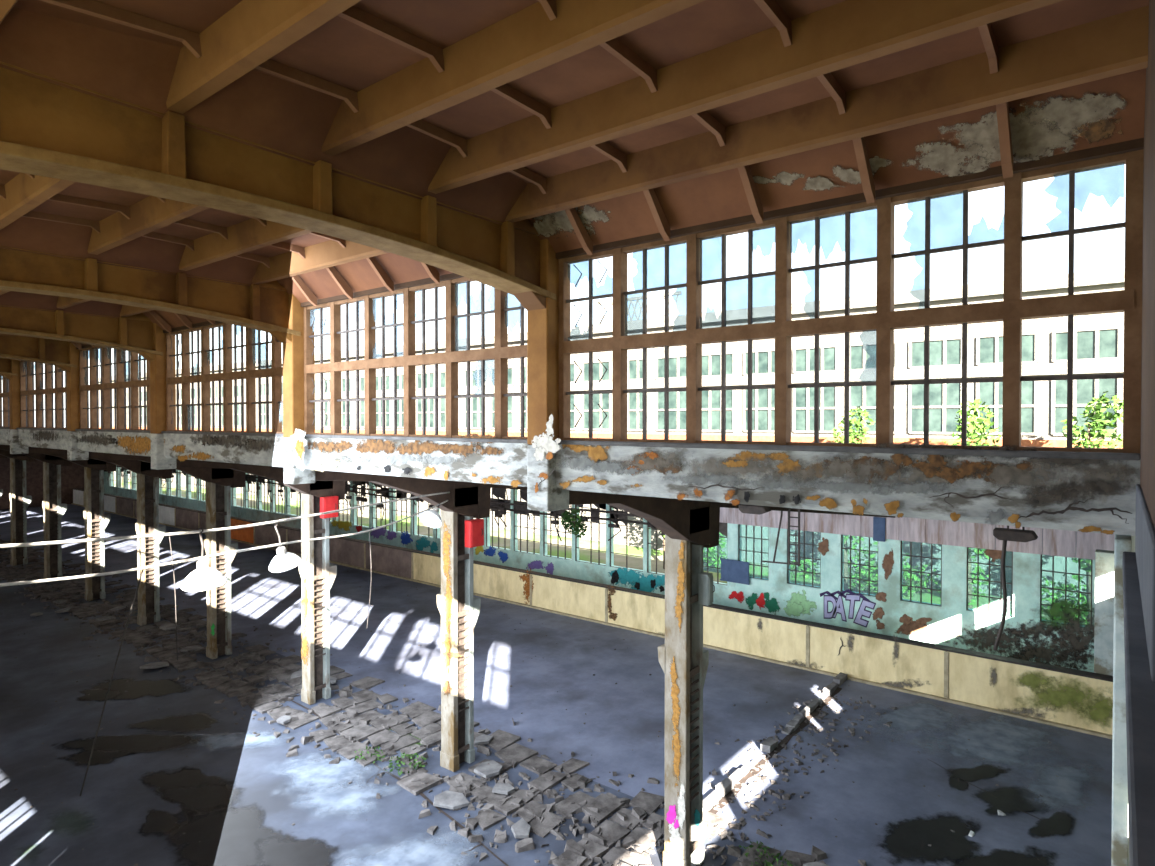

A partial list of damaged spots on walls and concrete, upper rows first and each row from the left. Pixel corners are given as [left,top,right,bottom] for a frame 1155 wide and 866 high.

peeling [753,93,1126,191]
spalling [191,429,503,475]
peeling [532,414,562,461]
spalling [722,451,1033,484]
crack [930,487,1132,524]